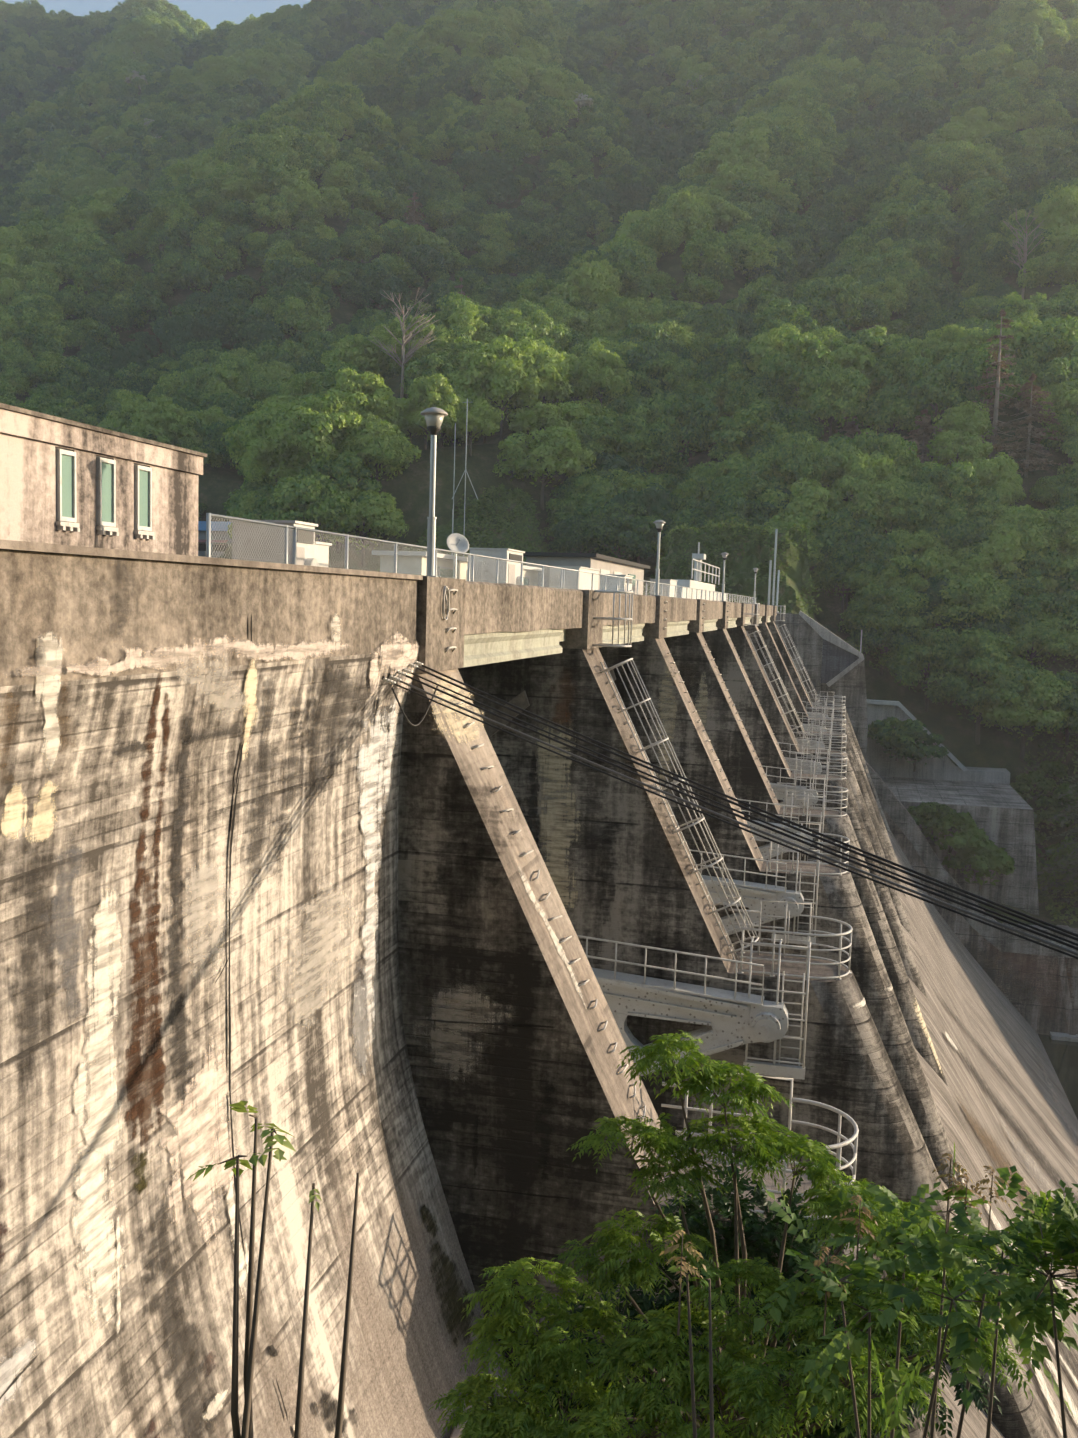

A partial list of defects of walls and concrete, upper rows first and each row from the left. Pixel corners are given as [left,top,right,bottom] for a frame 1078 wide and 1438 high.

damp [0,633,128,1333]
damp [114,740,147,757]
rust [124,675,170,1151]
crack [215,741,245,1256]
damp [140,660,398,1438]
damp [415,989,507,1080]
damp [0,1341,36,1406]